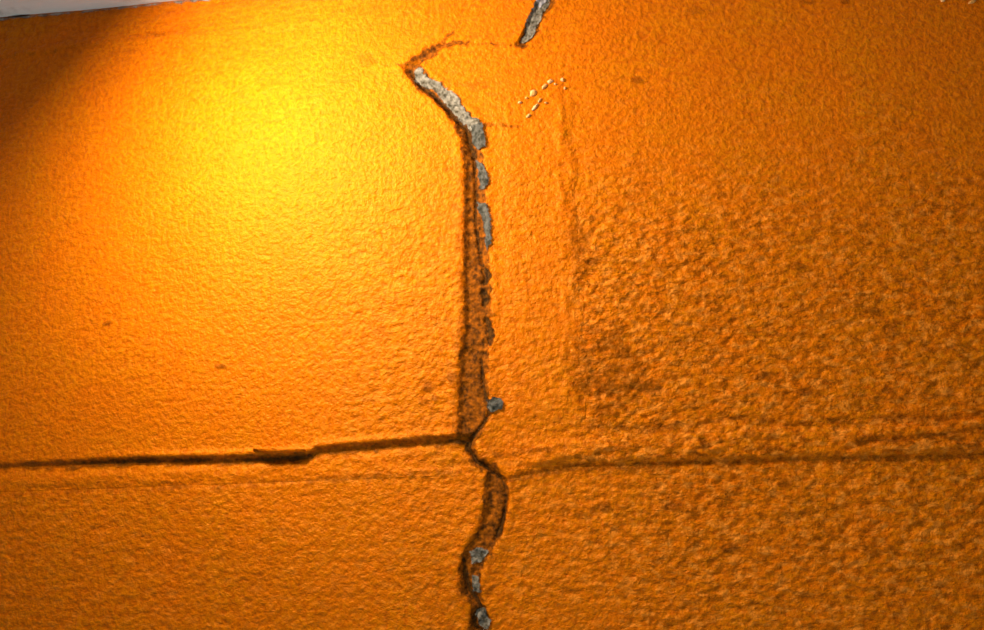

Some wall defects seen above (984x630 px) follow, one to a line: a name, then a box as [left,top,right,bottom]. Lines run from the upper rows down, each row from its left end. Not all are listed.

crack [516,0,555,49]
crack [0,32,796,630]
crack [740,413,984,461]